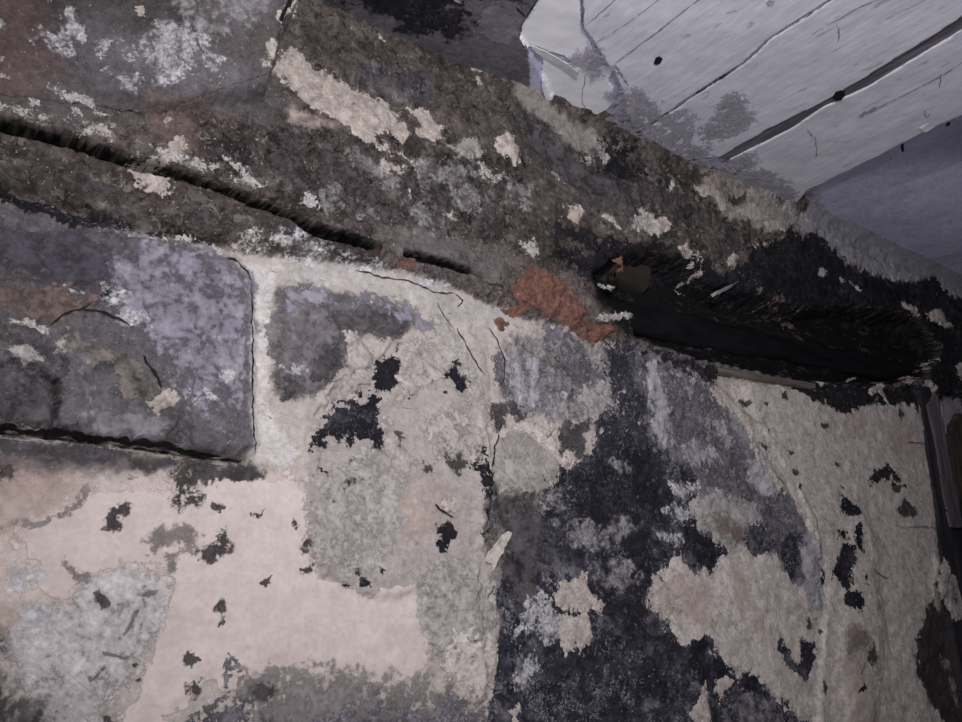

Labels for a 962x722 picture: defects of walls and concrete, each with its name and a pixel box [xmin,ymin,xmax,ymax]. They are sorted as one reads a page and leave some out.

crack [279,0,293,25]
leakage [704,243,774,312]
leakage [818,267,862,292]
leakage [597,312,633,322]
crack [228,257,257,451]
flaking render [323,329,377,412]
leakage [272,286,434,489]
crack [0,423,221,458]
leakage [236,319,809,722]